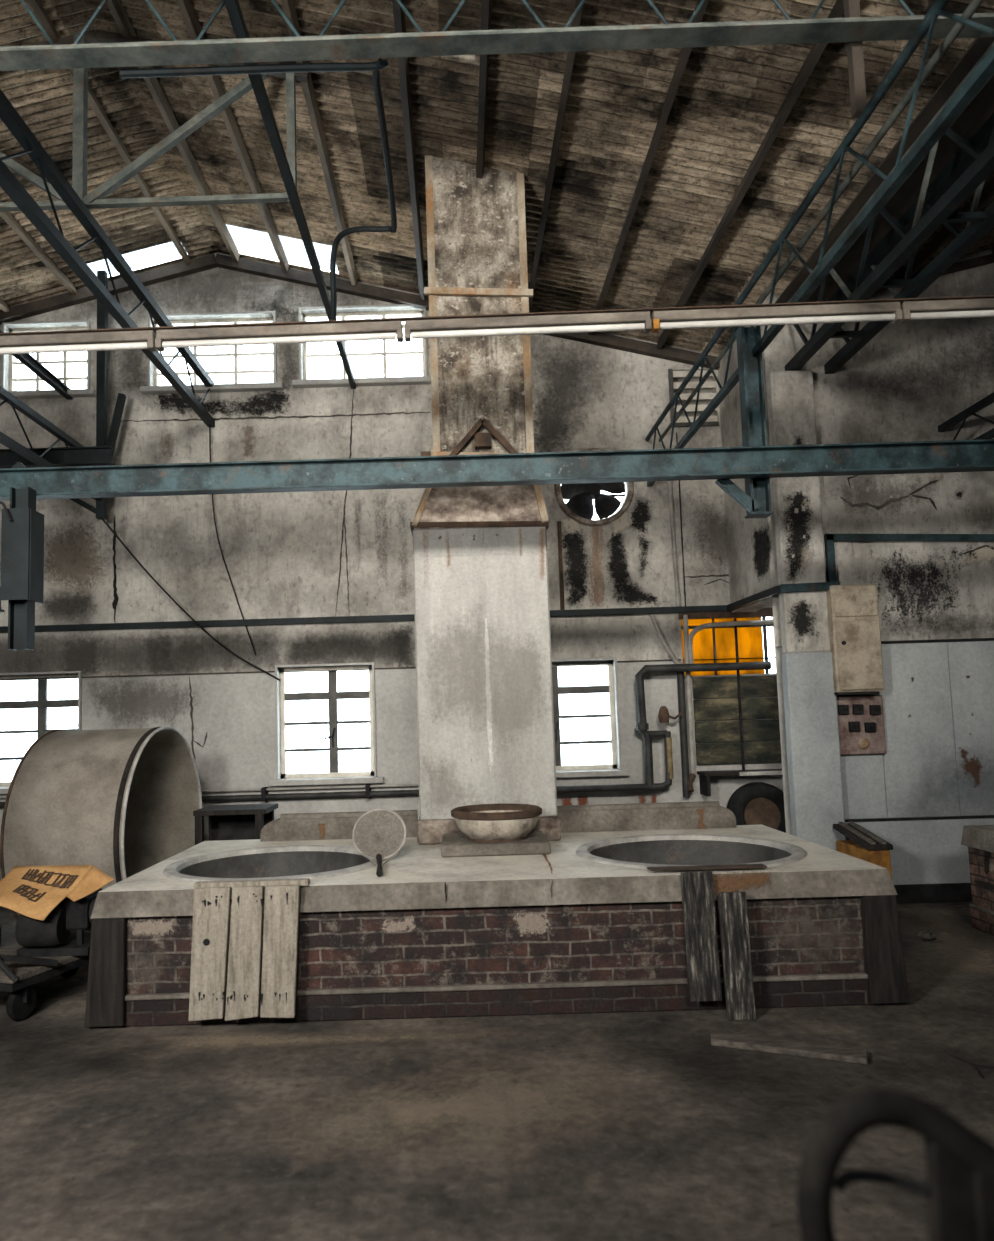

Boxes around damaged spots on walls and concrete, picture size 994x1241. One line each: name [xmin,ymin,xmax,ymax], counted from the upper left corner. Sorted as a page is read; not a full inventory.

mould [259,300,296,322]
mould [119,349,146,388]
mould [154,344,299,417]
crack [840,475,938,511]
mould [562,531,589,606]
mould [606,497,665,607]
leakage [873,545,976,631]
mould [787,600,818,641]
rust [960,747,983,785]